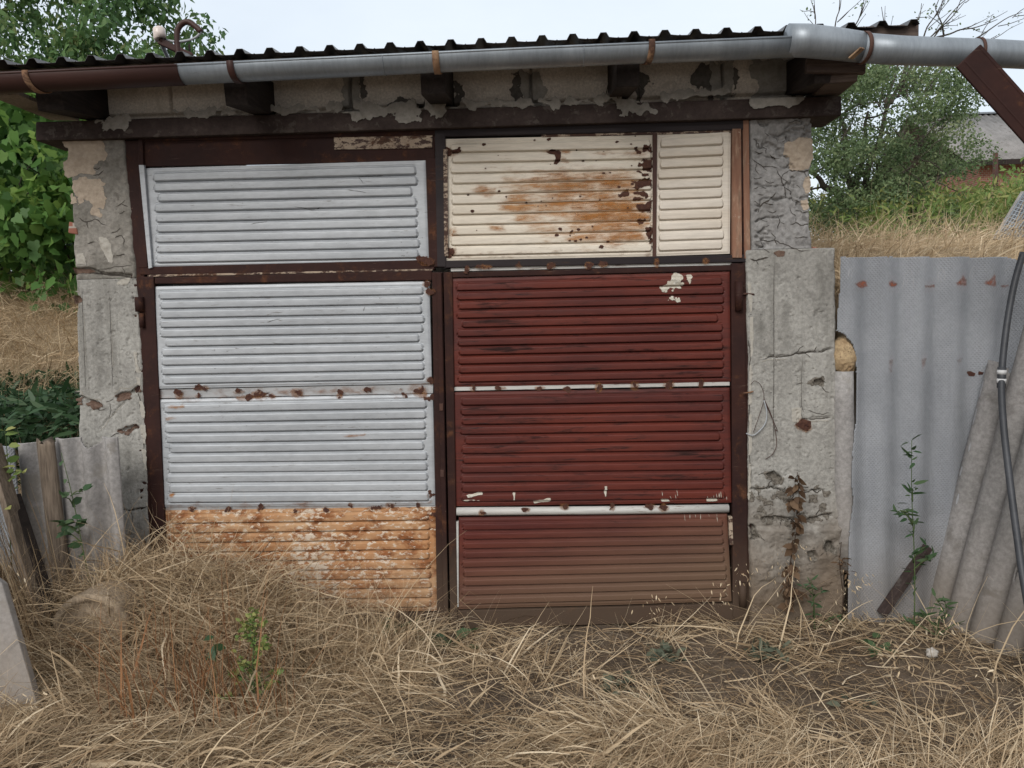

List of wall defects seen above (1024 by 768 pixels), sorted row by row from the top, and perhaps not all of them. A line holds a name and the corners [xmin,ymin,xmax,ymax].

peeling [62,141,108,218]
rust [467,130,732,245]
crack [751,96,810,263]
peeling [783,137,814,210]
peeling [659,272,693,302]
spalling [76,352,147,470]
rust [173,384,206,408]
rust [235,388,302,401]
rust [401,377,434,401]